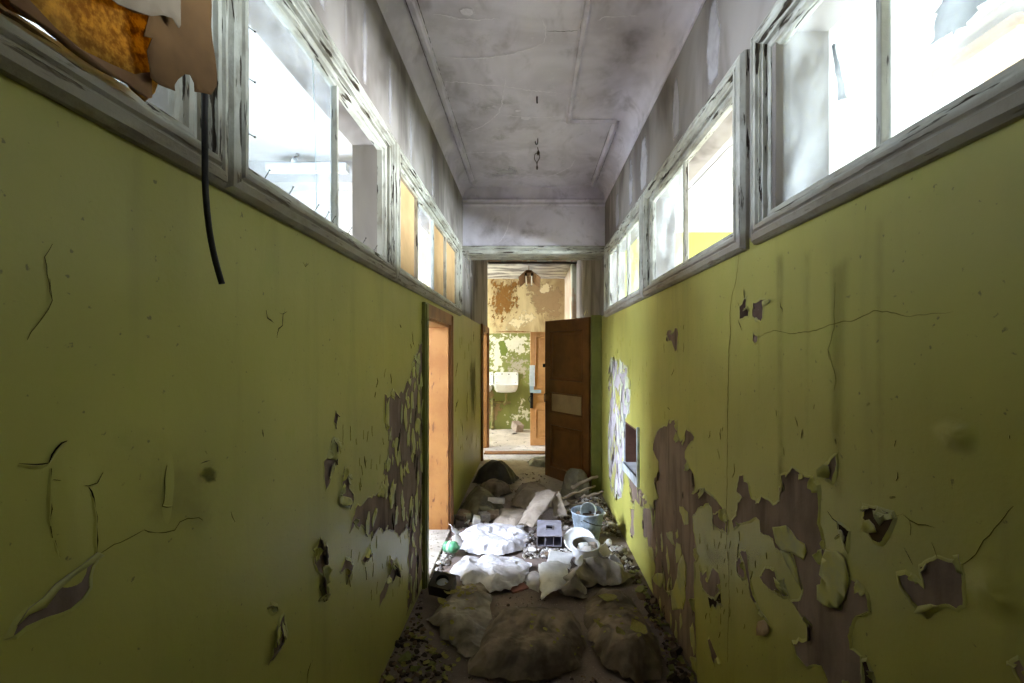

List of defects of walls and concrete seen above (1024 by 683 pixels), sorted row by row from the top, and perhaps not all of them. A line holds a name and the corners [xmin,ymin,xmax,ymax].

crack [27,245,53,340]
flaking render [489,281,563,385]
peeling [666,327,679,353]
peeling [739,297,770,345]
crack [728,259,950,389]
peeling [489,390,530,425]
crack [17,441,202,558]
peeling [313,341,423,616]
peeling [608,357,898,683]
crack [962,508,1011,565]
peeling [3,552,105,640]
peeling [896,554,967,619]